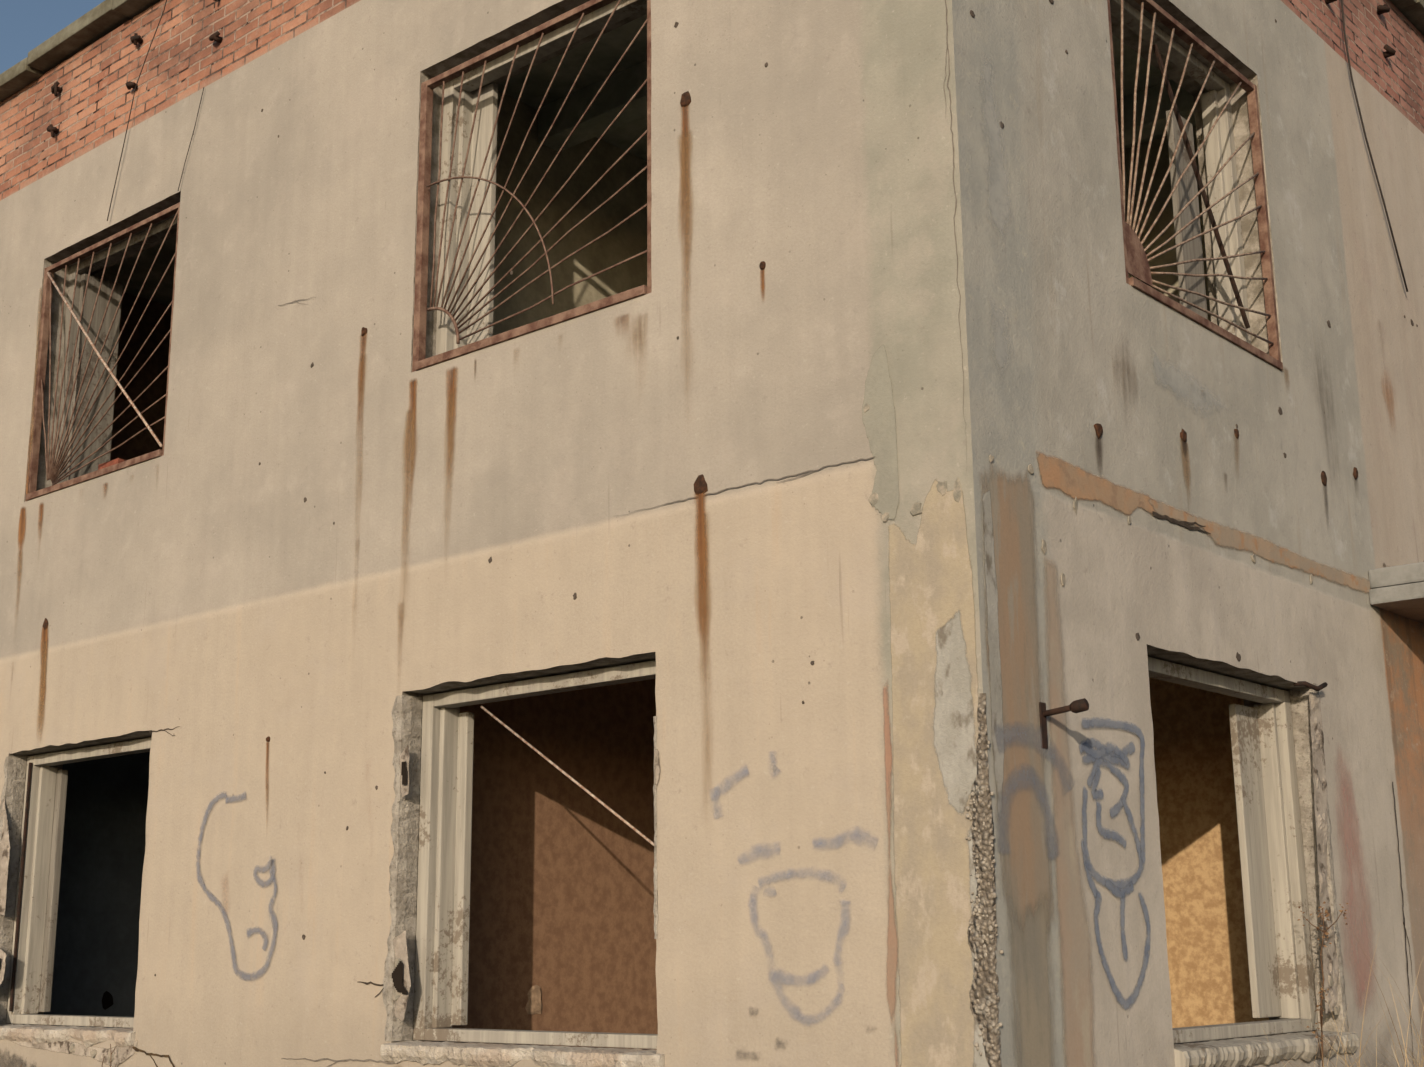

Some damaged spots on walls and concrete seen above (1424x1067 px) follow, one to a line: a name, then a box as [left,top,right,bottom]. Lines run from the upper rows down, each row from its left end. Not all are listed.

rust [680,91,691,270]
rust [405,380,416,500]
rust [447,368,456,472]
rust [694,474,708,645]
rust [39,618,48,726]
peeling [862,345,1371,1067]
spalling [399,745,409,797]
spalling [0,798,10,916]
spalling [392,930,411,1021]
damp [0,1052,34,1067]